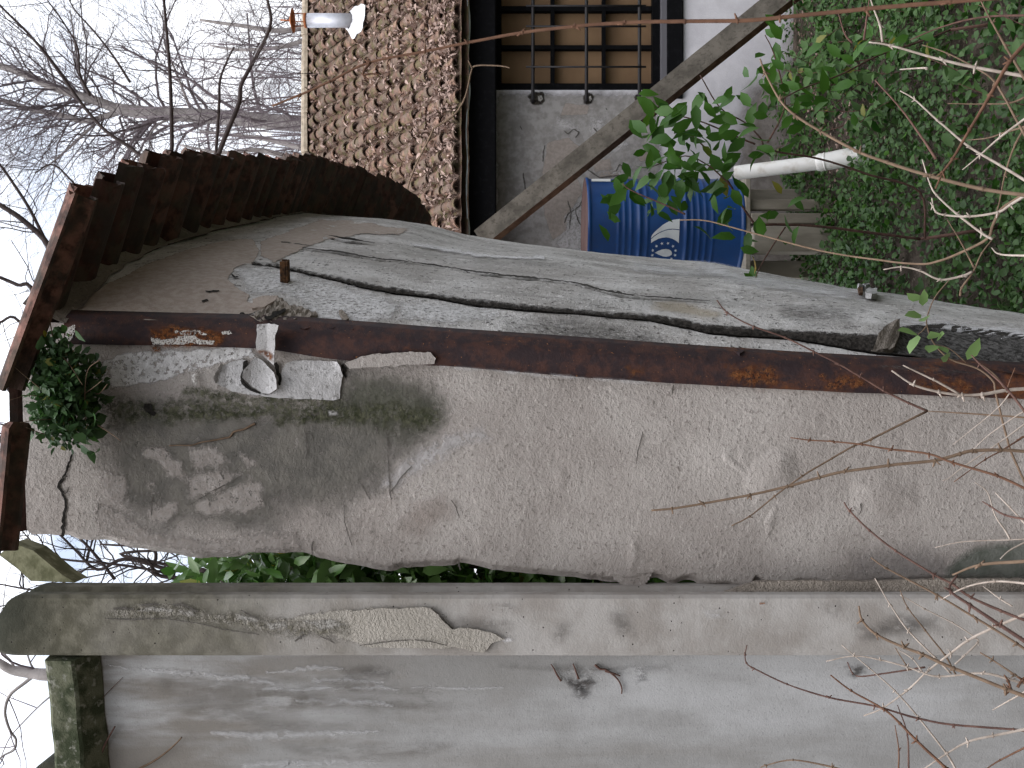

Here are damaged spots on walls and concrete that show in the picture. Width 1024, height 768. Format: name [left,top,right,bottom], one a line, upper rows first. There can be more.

rust [151,325,222,351]
peeling [78,219,408,400]
crack [252,235,1024,375]
crack [57,453,74,537]
water stain [110,382,481,528]